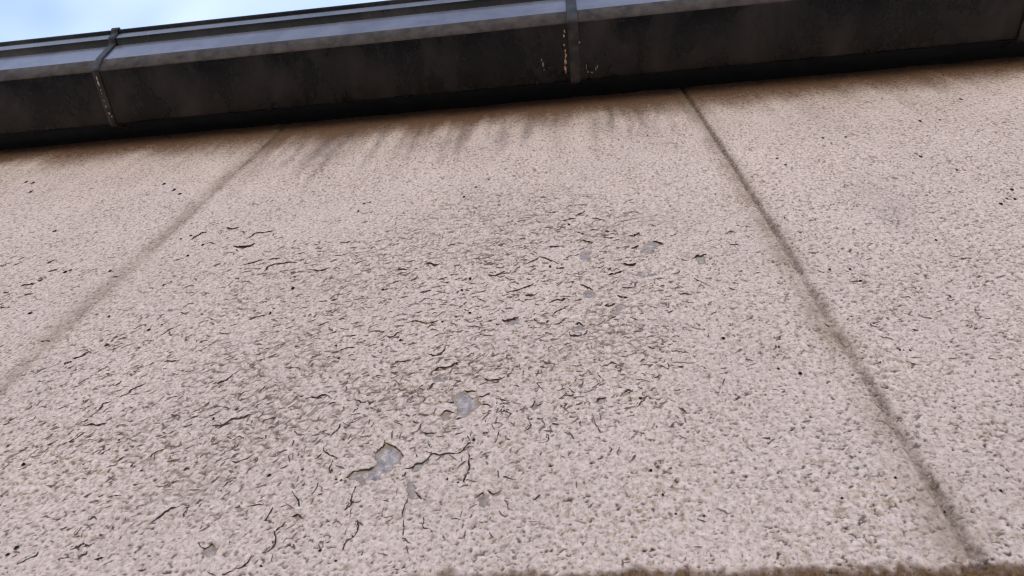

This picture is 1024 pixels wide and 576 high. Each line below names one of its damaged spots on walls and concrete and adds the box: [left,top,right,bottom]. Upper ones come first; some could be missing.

crack [869,273,955,339]
crack [0,187,760,575]
peeling [422,384,499,437]
crack [720,322,789,384]
peeling [342,437,432,520]